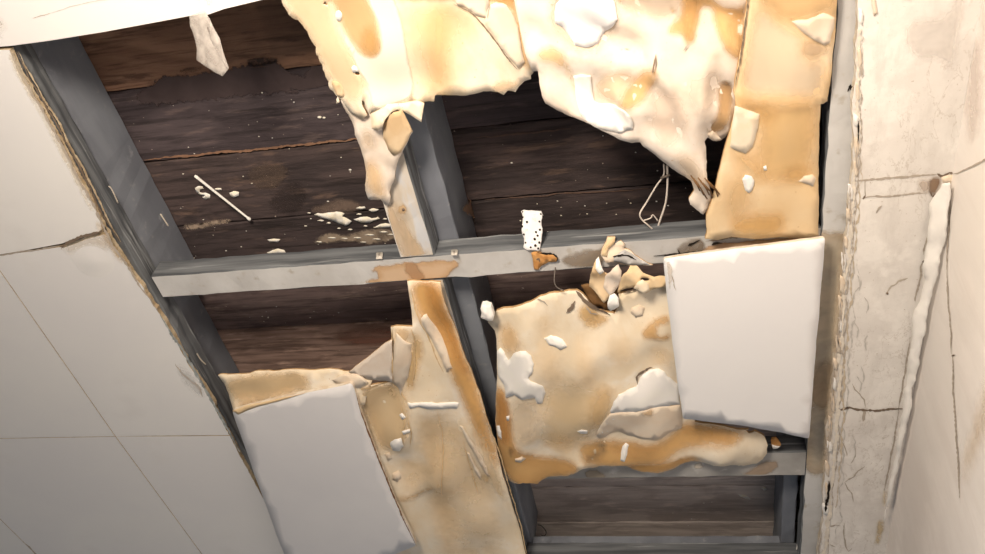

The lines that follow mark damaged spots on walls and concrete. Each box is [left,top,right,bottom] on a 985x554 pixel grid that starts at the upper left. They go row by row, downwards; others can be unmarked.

damp [136,0,378,107]
peeling [344,0,412,107]
damp [623,0,743,57]
peeling [573,74,633,133]
damp [694,79,732,141]
peeling [308,201,394,244]
damp [229,375,306,400]
peeling [497,348,545,404]
damp [364,205,738,484]
peeling [577,369,682,462]
crack [840,343,910,499]
crack [859,159,985,498]